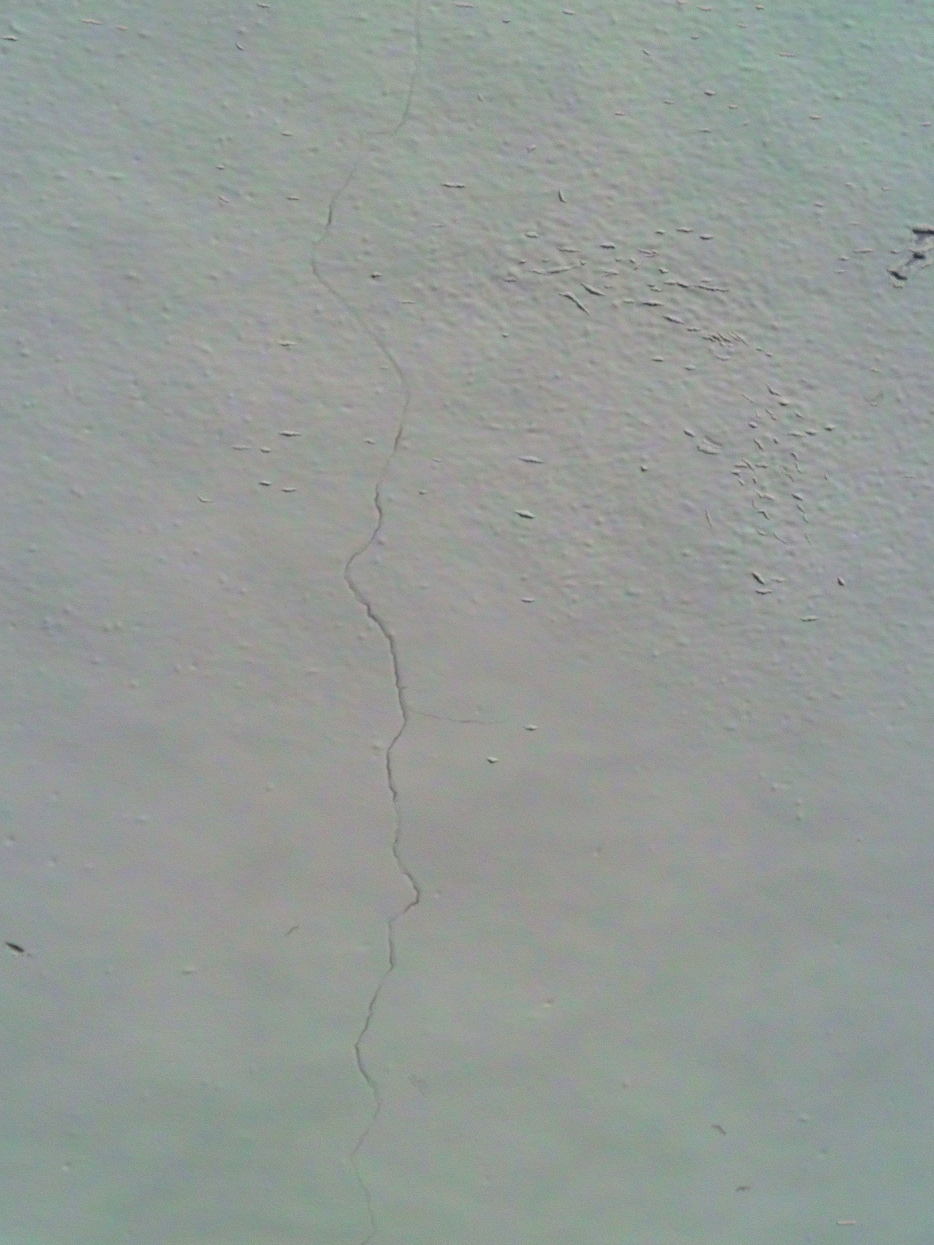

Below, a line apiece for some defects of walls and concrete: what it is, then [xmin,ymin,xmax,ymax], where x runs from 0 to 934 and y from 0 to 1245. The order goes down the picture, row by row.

crack [309,0,507,1245]
spalling [887,223,934,287]